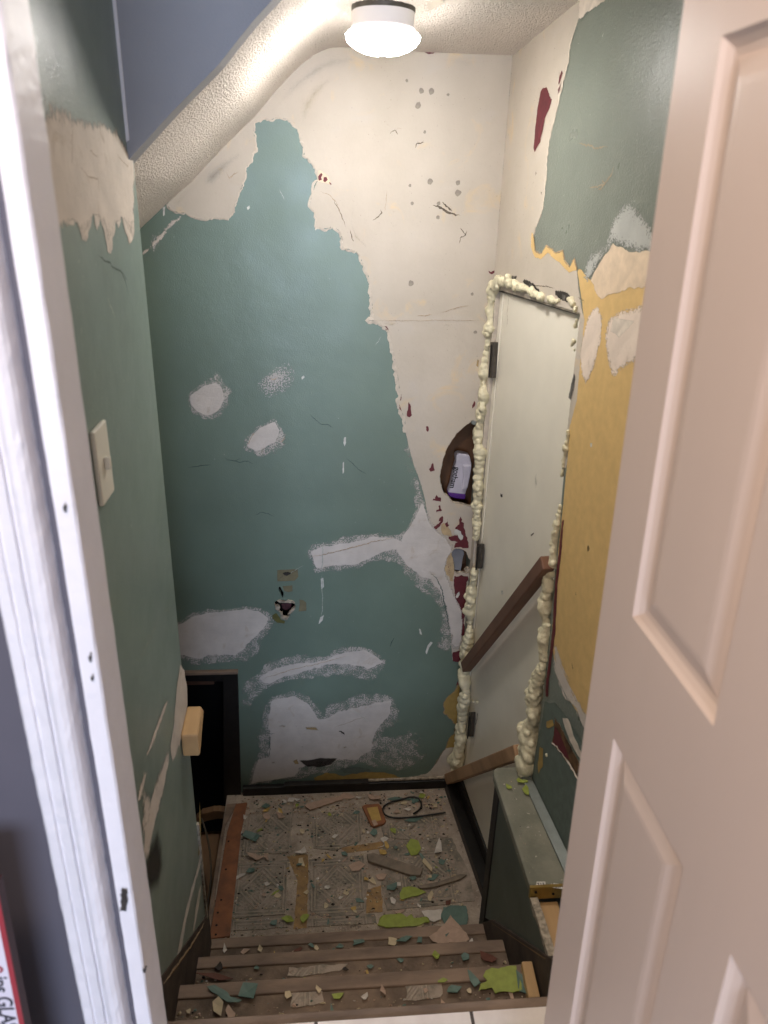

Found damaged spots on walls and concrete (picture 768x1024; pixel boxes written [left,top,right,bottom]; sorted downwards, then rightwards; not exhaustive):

peeling [166,0,645,716]